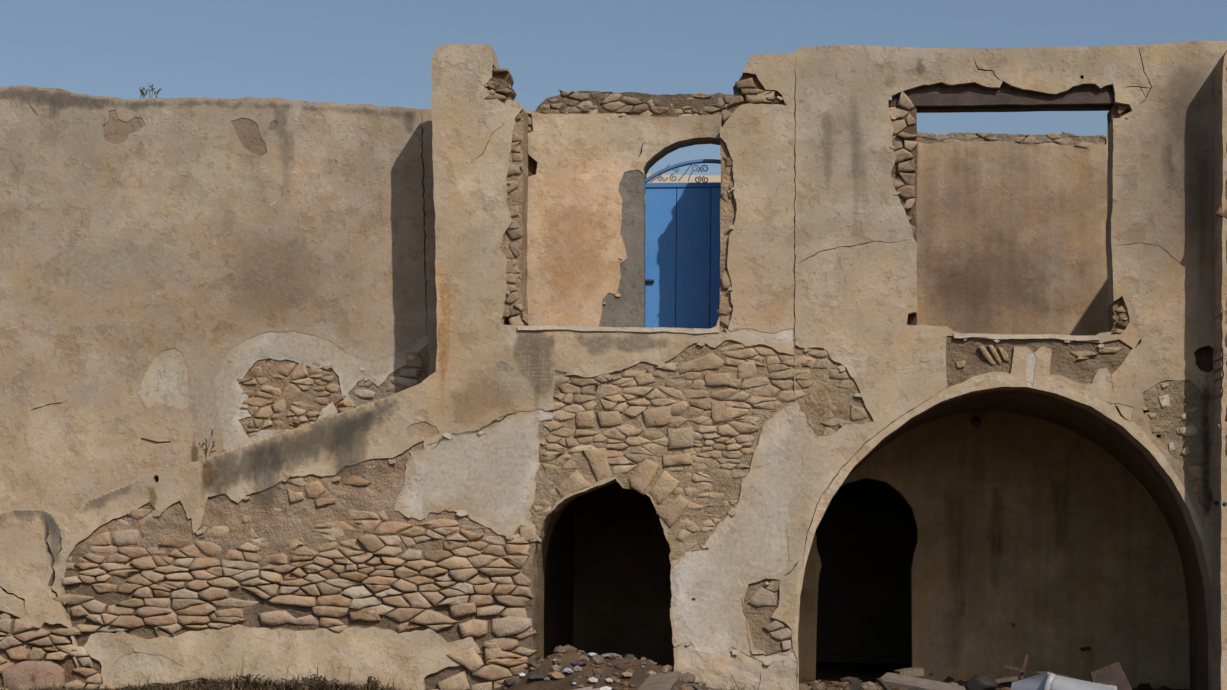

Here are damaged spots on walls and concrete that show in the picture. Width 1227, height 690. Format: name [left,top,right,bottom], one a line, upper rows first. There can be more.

crack [793,57,895,391]
spalling [889,91,1130,243]
spalling [0,66,874,690]
spalling [946,297,1133,387]
spalling [1107,379,1227,510]